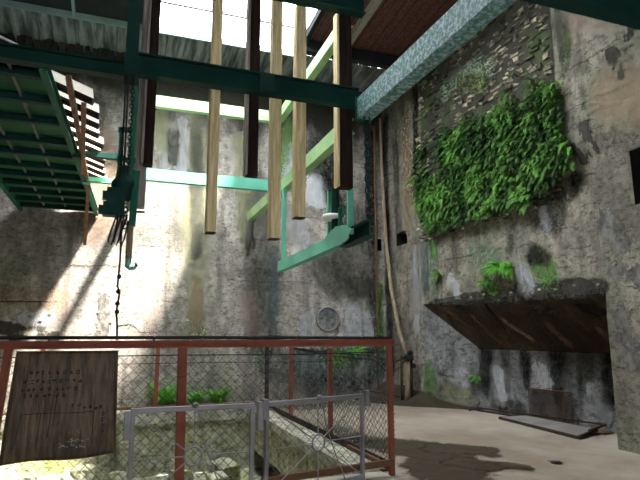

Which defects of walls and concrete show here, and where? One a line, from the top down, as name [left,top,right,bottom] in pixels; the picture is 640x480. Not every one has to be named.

water stain [539,172,583,235]
water stain [447,276,460,297]
water stain [515,244,549,289]
water stain [479,348,526,416]
water stain [519,350,565,406]
water stain [580,352,615,409]
water stain [323,426,535,480]